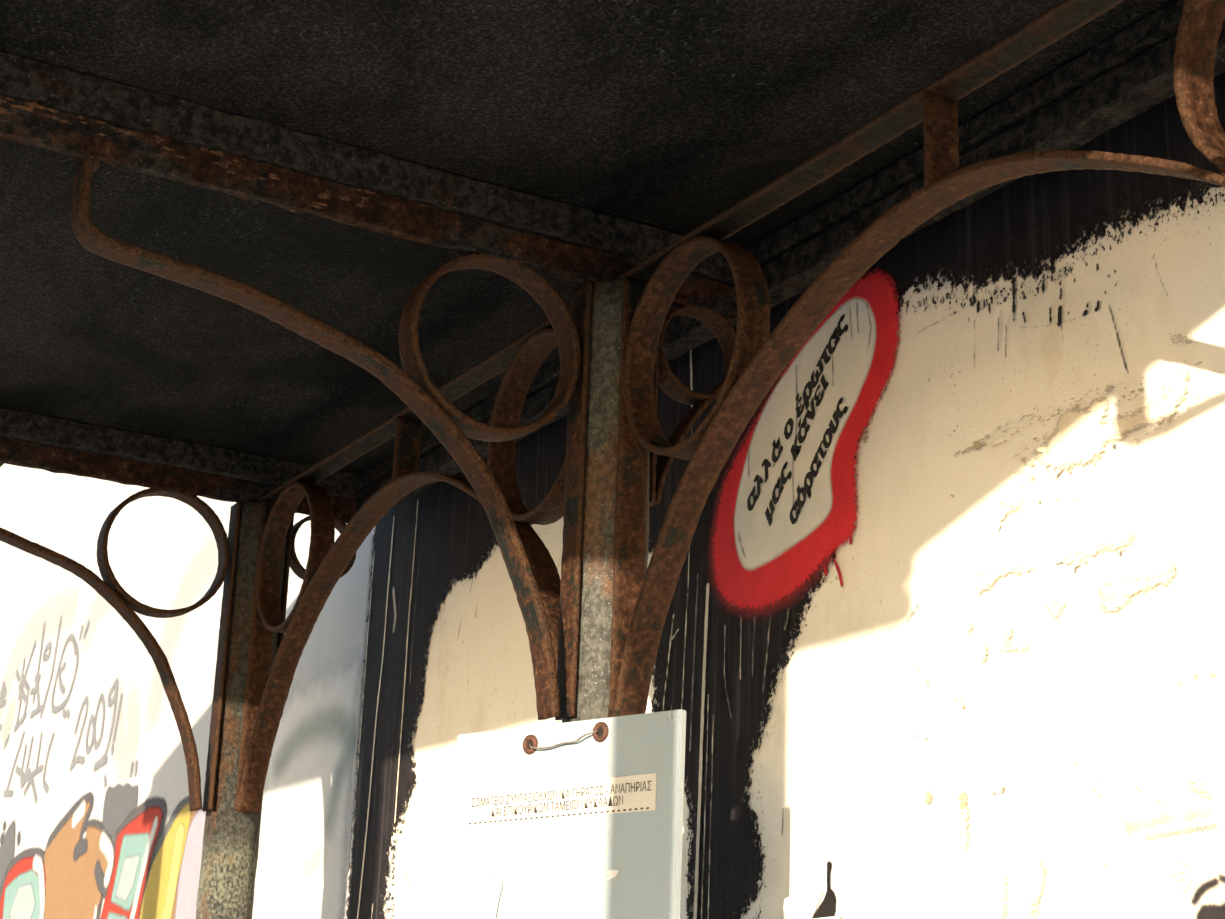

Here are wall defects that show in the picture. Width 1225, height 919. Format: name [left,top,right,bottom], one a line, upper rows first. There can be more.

corrosion [0,96,136,136]
peeling [957,361,1202,489]